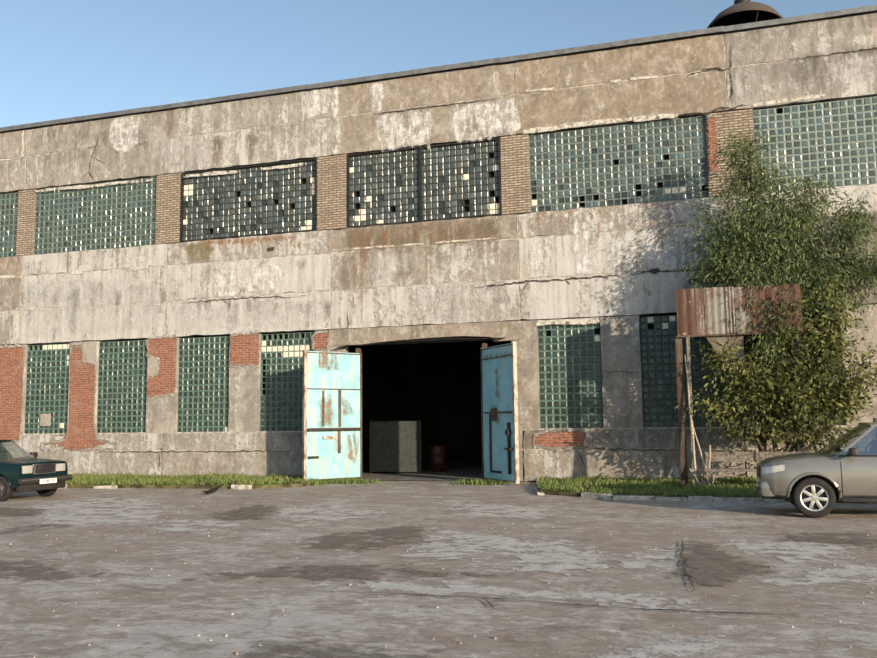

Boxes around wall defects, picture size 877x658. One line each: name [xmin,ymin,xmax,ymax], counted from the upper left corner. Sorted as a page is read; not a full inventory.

damp [109,116,140,153]
damp [372,83,433,150]
damp [451,99,521,142]
flaking render [145,334,178,400]
flaking render [38,341,119,452]
rust [321,399,347,427]
flaking render [532,427,589,451]